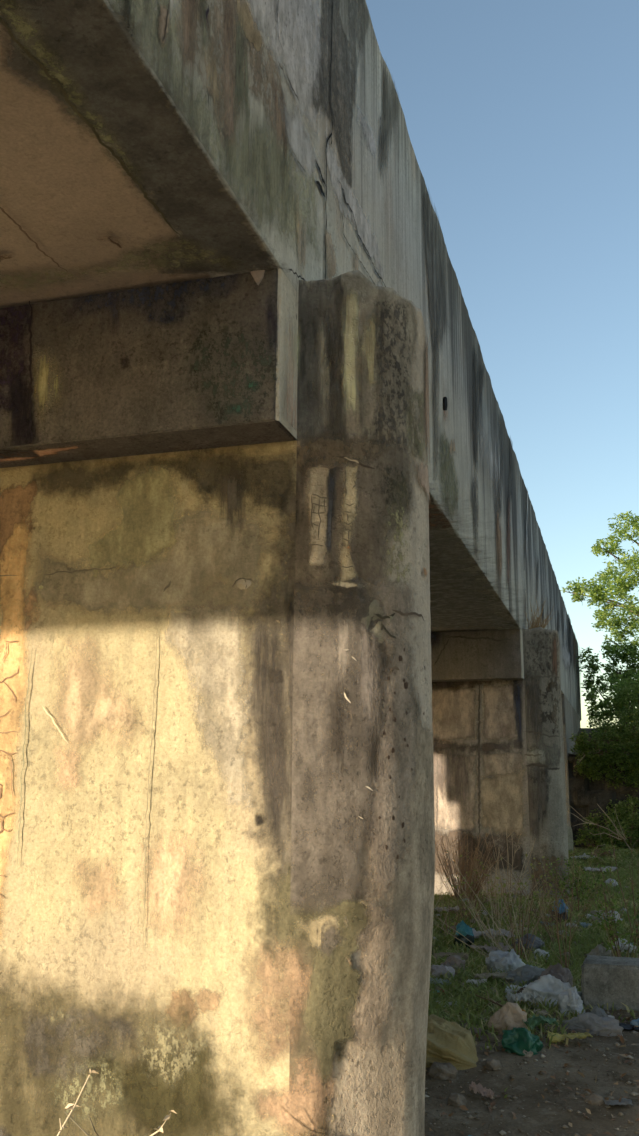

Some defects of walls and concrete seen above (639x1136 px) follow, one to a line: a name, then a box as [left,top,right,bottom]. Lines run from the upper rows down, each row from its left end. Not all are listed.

water stain [0,0,383,296]
water stain [380,67,399,174]
water stain [424,192,517,647]
crack [0,641,68,898]
water stain [0,270,560,1136]
crack [393,610,424,620]
water stain [525,564,581,715]